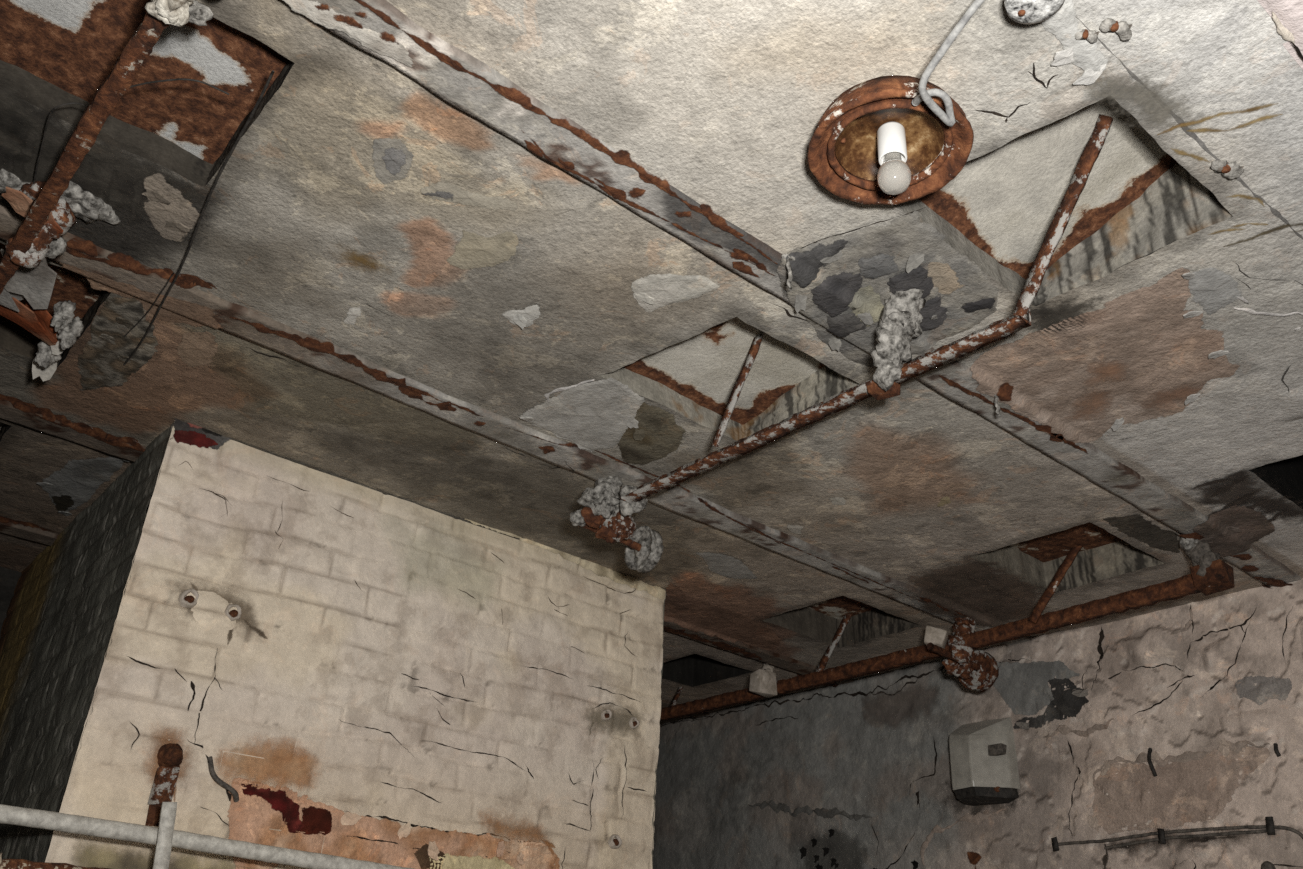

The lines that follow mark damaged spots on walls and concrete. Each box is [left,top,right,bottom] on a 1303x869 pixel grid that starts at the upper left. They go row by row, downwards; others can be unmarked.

rust [316,0,777,278]
rust [66,238,217,289]
spalling [777,211,999,369]
rust [939,375,1089,454]
rust [676,485,966,616]
crack [127,648,223,761]
peeling [994,660,1089,730]
crack [1082,605,1256,717]
spalling [227,778,560,869]
crack [339,673,534,860]
crack [561,749,647,869]
leakage [800,829,876,869]